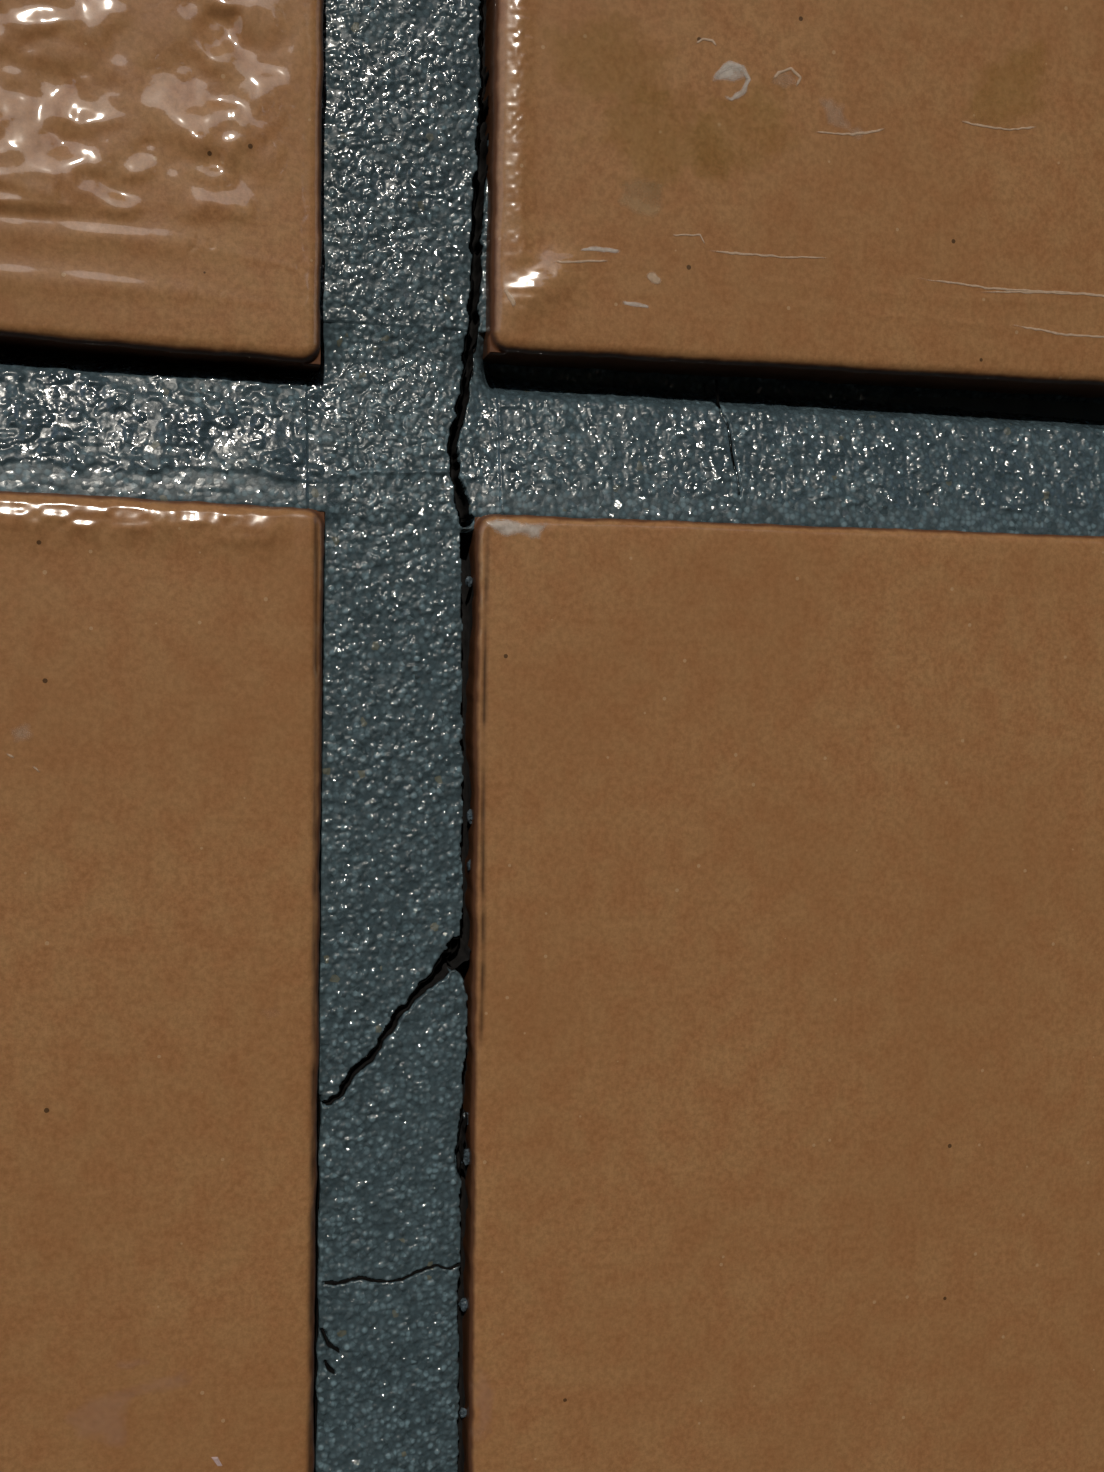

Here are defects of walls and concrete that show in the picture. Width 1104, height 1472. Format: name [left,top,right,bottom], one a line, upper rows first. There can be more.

crack [314,0,489,1472]